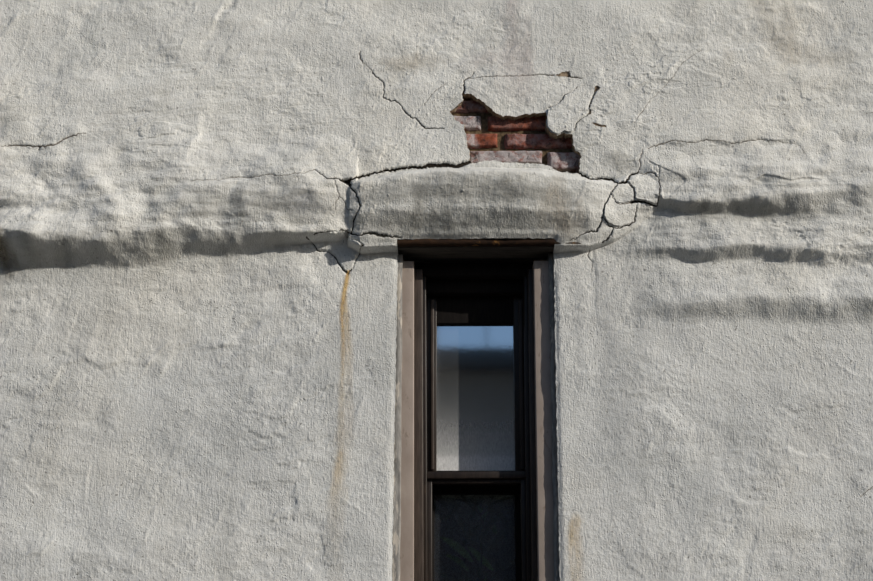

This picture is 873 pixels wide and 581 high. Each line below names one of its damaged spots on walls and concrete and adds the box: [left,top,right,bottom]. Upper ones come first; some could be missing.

crack [1,133,86,149]
crack [359,53,596,131]
spalling [450,86,606,174]
crack [225,161,471,274]
corrosion [341,271,349,332]